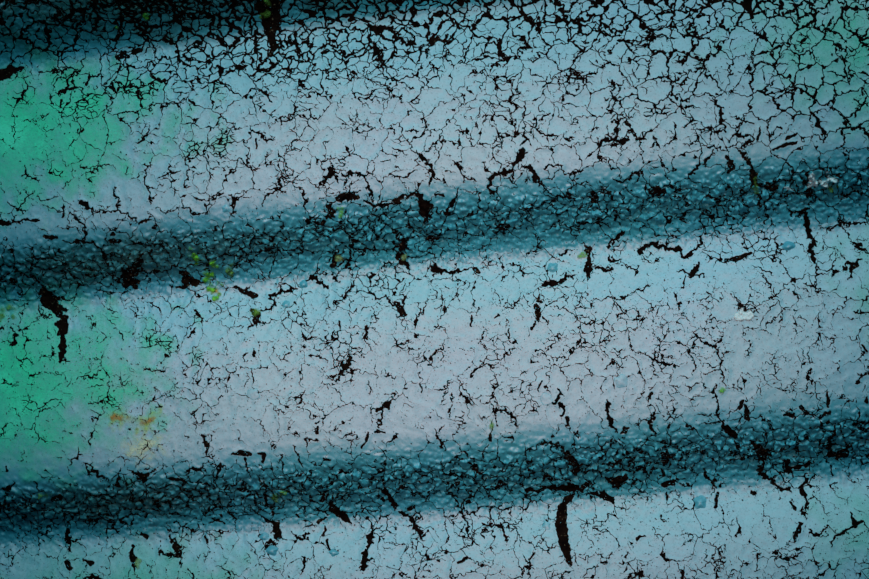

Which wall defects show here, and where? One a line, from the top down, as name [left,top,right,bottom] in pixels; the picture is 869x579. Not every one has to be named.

peeling [0,64,24,81]
crack [19,139,75,191]
crack [677,260,705,290]
peeling [38,286,70,365]
crack [0,392,77,444]
crack [53,448,83,477]
peeling [541,439,591,567]
crack [121,550,175,579]
crack [536,548,615,579]